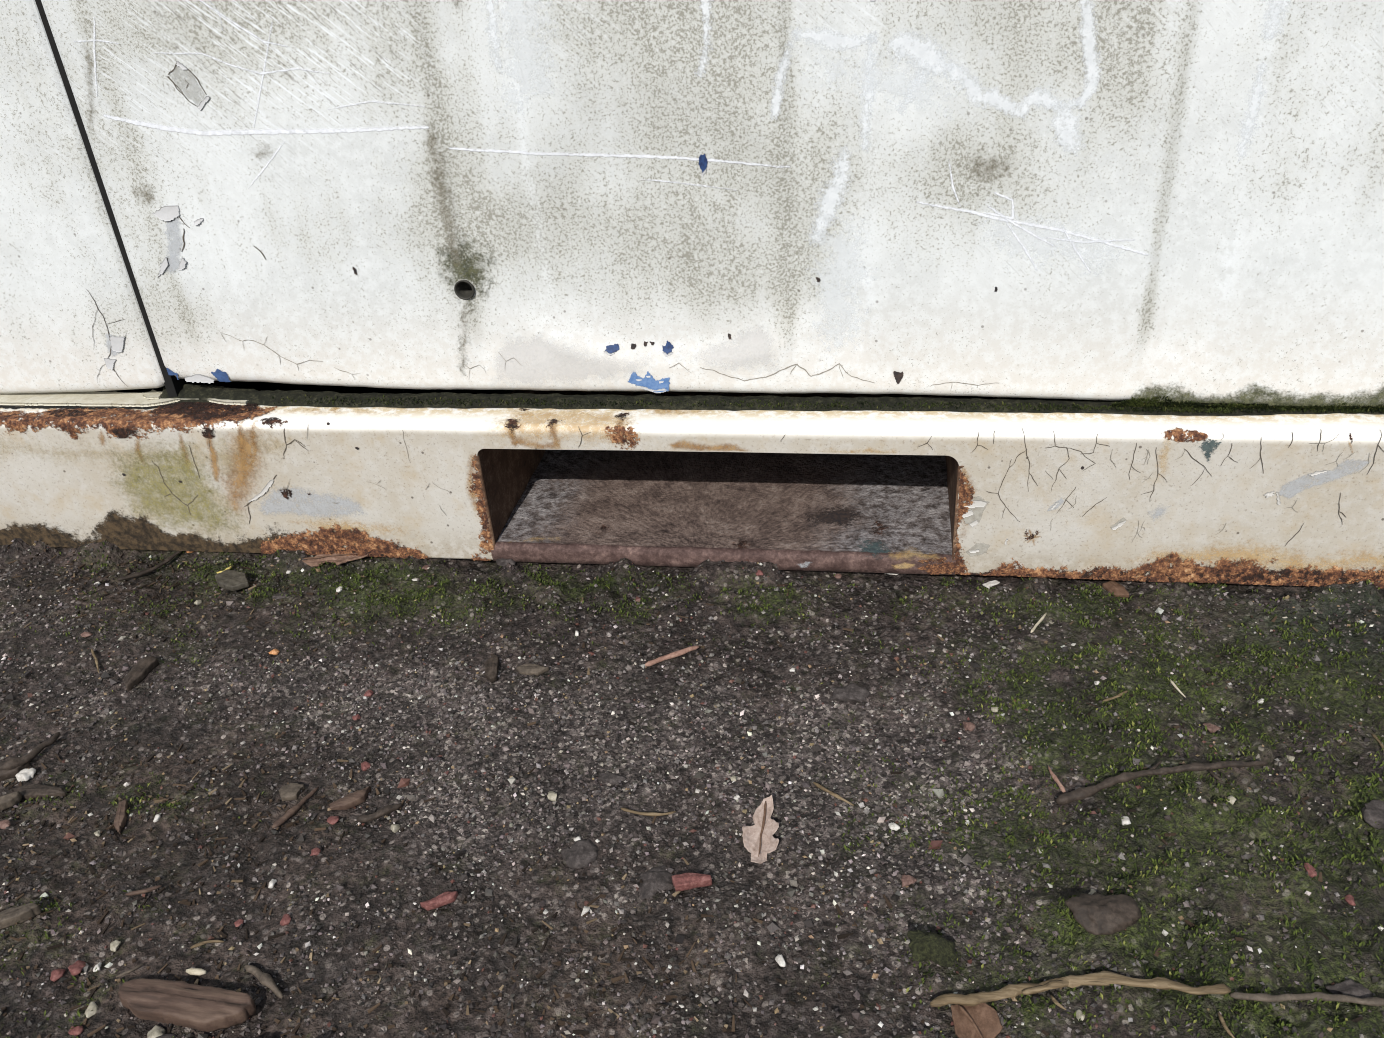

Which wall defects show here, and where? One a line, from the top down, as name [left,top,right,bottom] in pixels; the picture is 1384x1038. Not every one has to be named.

peeling [166,61,210,110]
peeling [152,205,203,277]
rust [0,402,288,509]
rust [504,408,640,450]
rust [671,442,743,451]
rust [1163,427,1208,442]
rust [260,523,430,559]
rust [467,454,494,561]
rust [805,505,888,535]
rust [894,472,1384,588]
crack [972,429,1383,542]